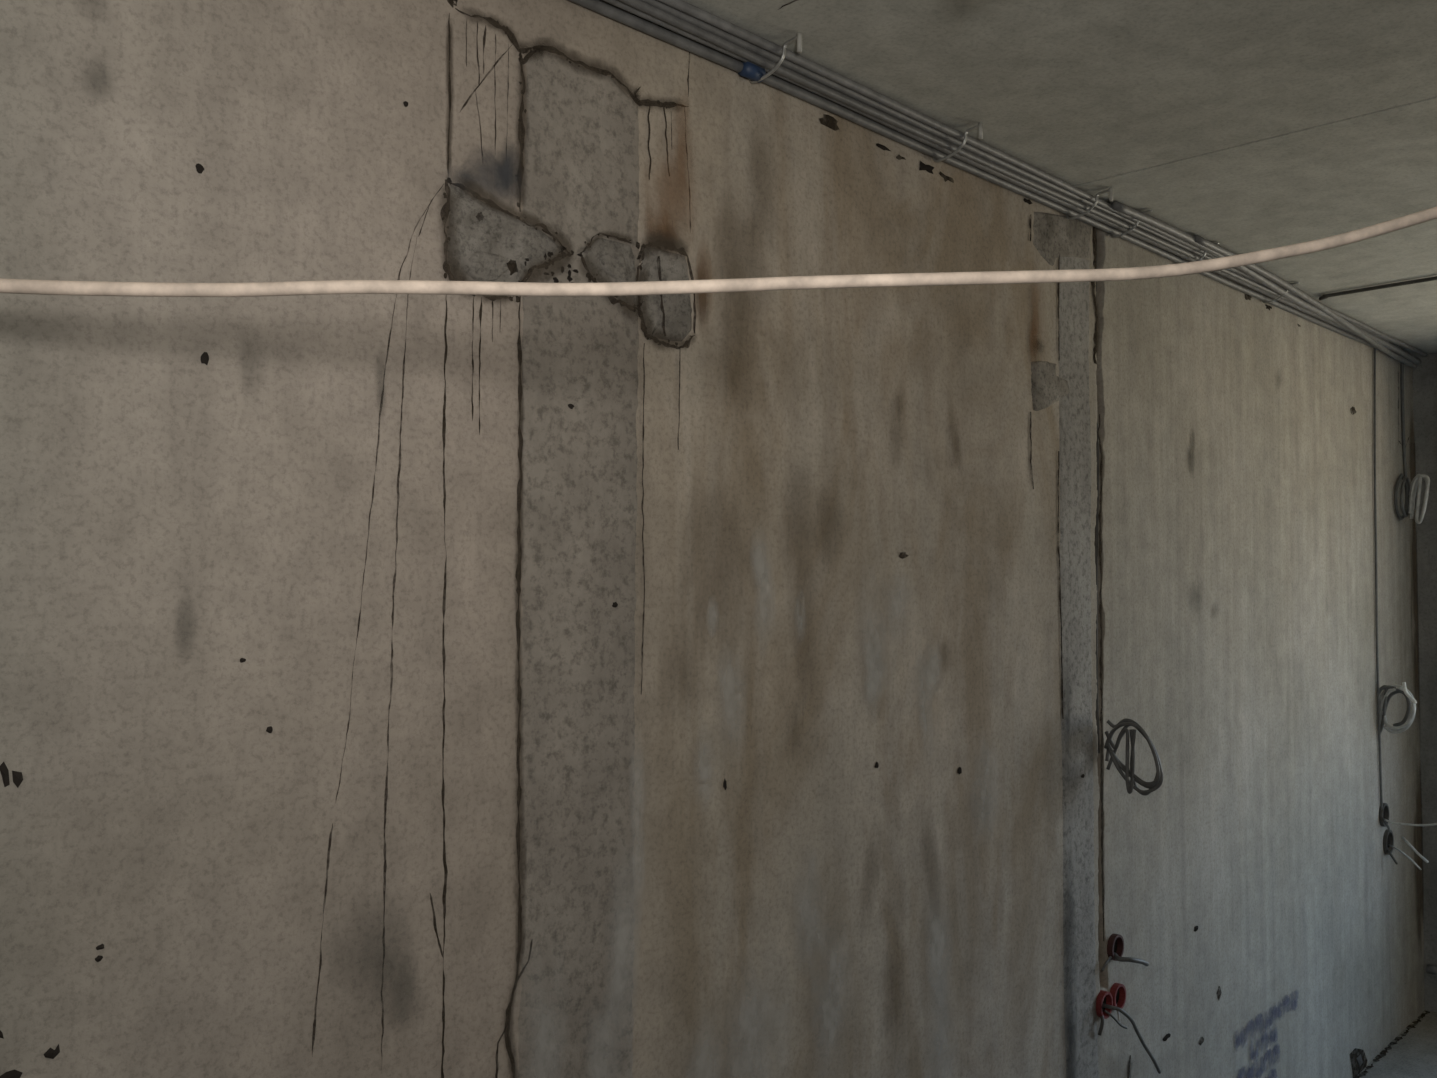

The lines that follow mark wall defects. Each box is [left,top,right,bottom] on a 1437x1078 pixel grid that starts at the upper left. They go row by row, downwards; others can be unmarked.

crack [312,0,691,1078]